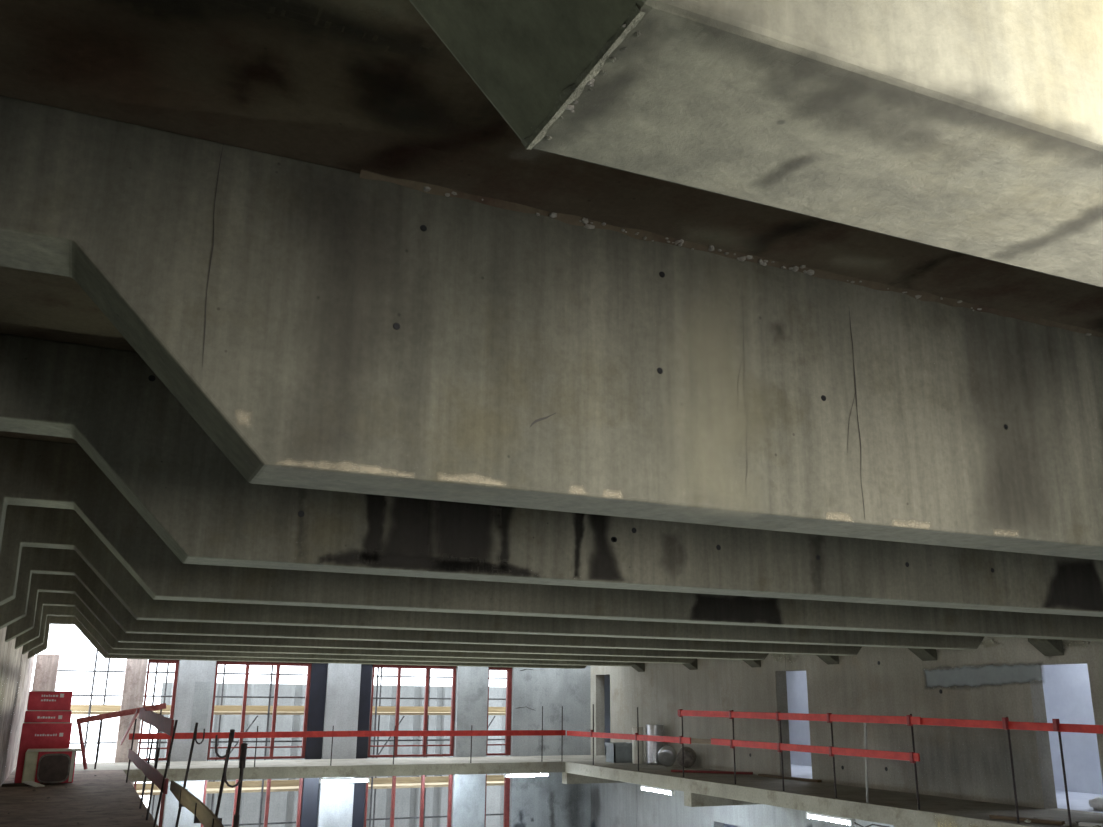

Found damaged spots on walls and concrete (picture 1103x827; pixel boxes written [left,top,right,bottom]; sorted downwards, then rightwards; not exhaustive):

damp [320,494,538,577]
damp [574,513,621,580]
damp [691,594,782,624]
damp [1044,561,1103,611]